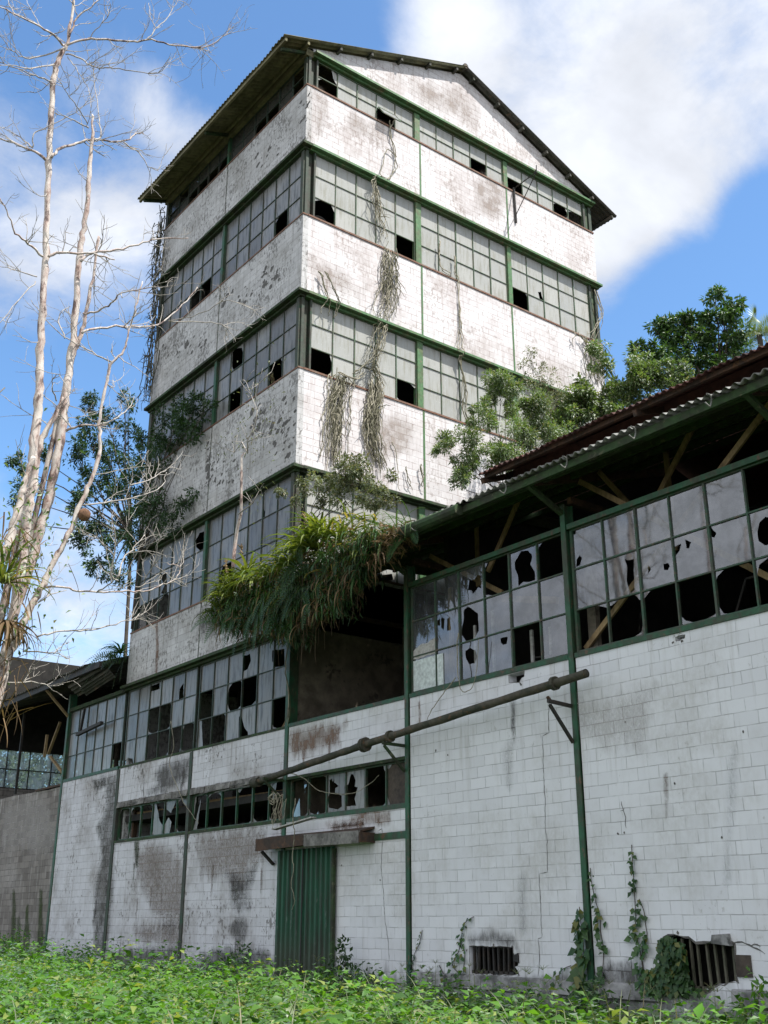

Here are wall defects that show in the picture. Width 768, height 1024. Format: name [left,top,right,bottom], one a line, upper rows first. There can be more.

leakage [116,840,182,967]
leakage [197,827,272,910]